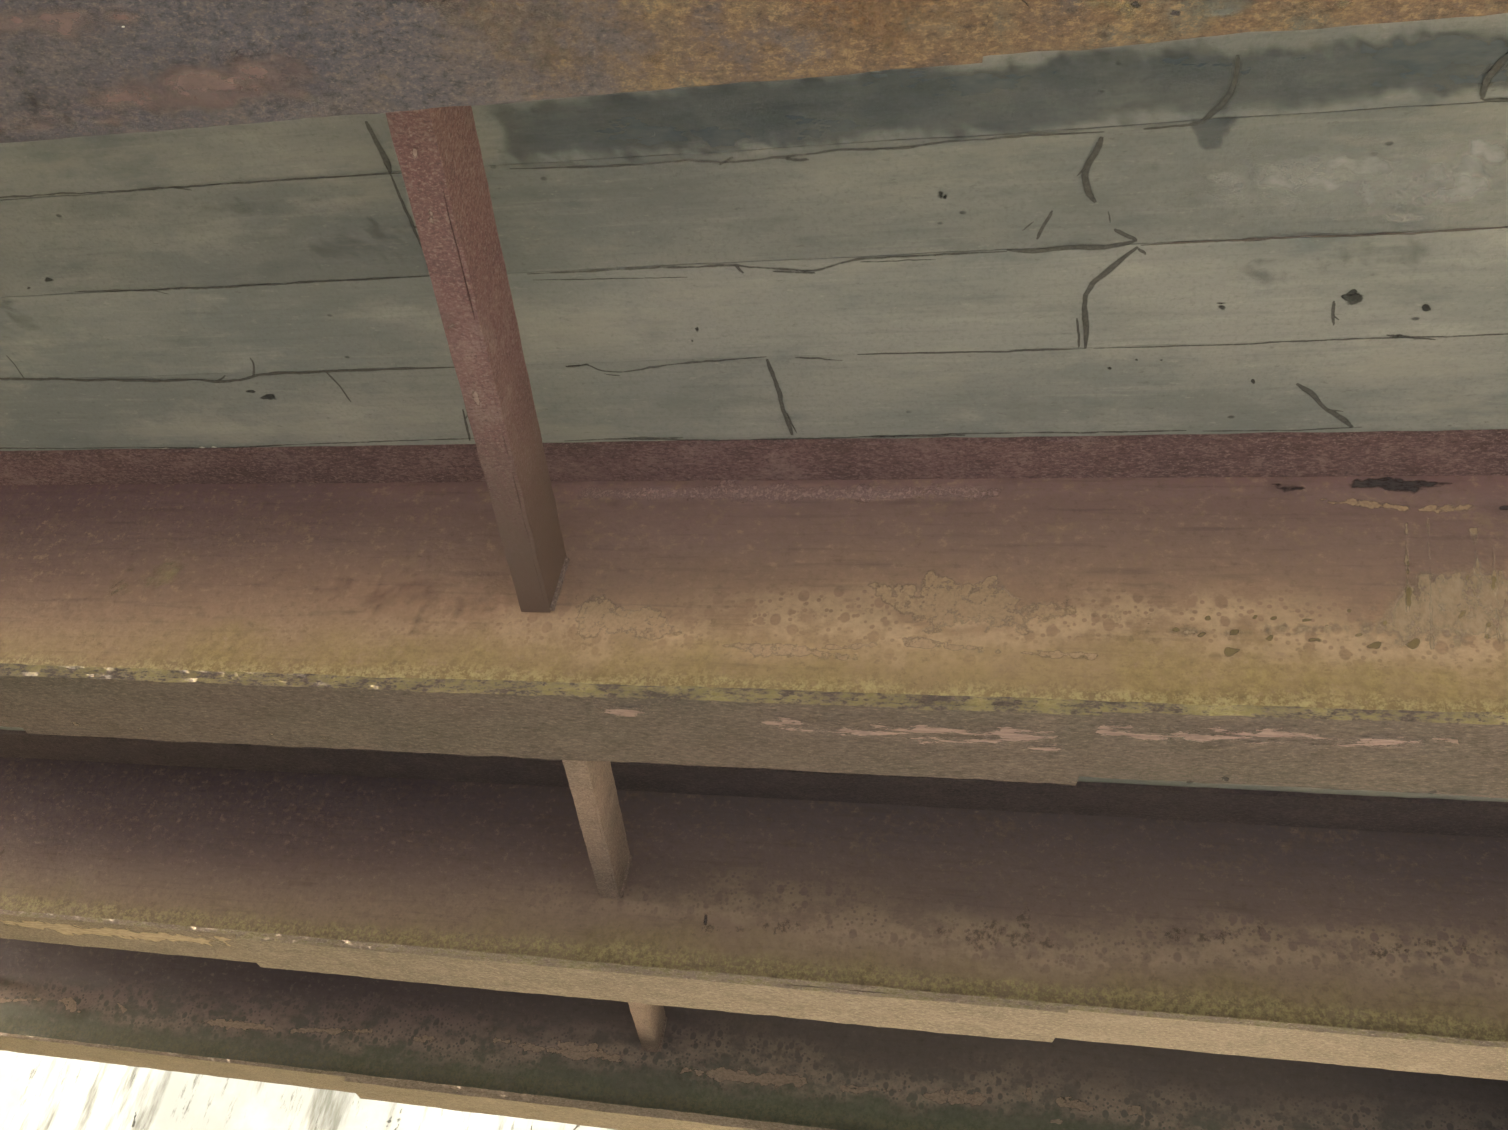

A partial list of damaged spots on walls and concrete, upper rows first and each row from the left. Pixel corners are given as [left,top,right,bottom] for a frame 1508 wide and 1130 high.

crack [1143,55,1240,130]
crack [1480,53,1508,102]
crack [0,121,427,294]
crack [510,131,1508,441]
leakage [1363,555,1508,649]
peeling [595,705,654,717]
peeling [762,717,1061,751]
peeling [1096,725,1458,748]